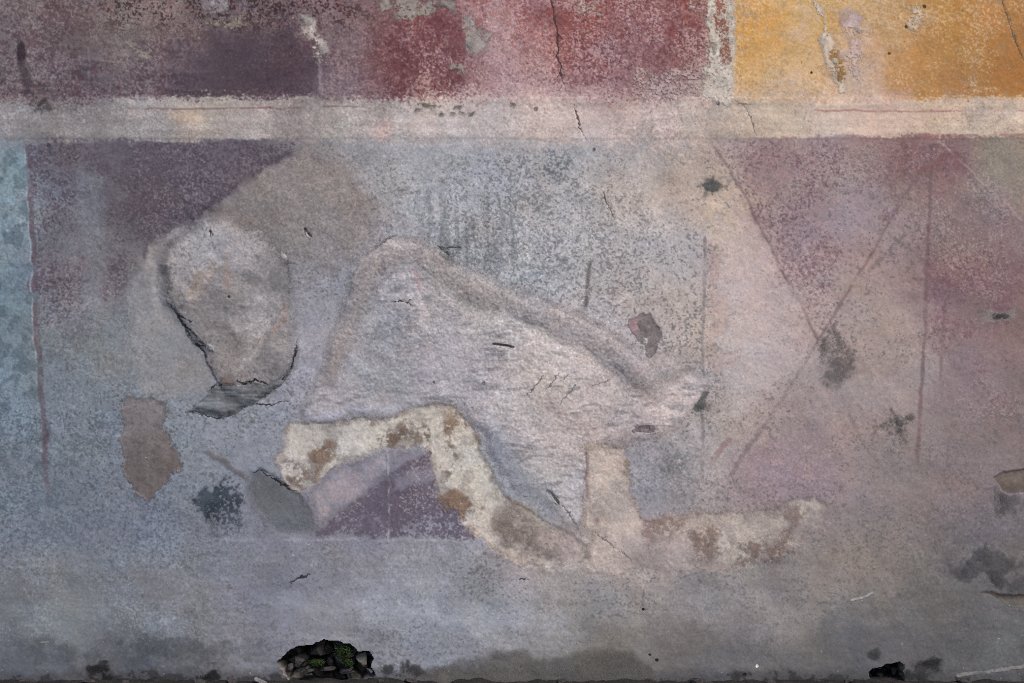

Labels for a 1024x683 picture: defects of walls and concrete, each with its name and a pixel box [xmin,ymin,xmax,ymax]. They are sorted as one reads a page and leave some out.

peeling [380,0,497,57]
crack [551,0,583,132]
peeling [814,0,871,93]
crack [1002,2,1022,55]
crack [171,305,207,357]
spalling [628,313,662,358]
crack [186,344,297,419]
spalling [118,395,183,500]
water stain [193,451,248,526]
spalling [250,401,828,576]
spalling [994,469,1024,493]